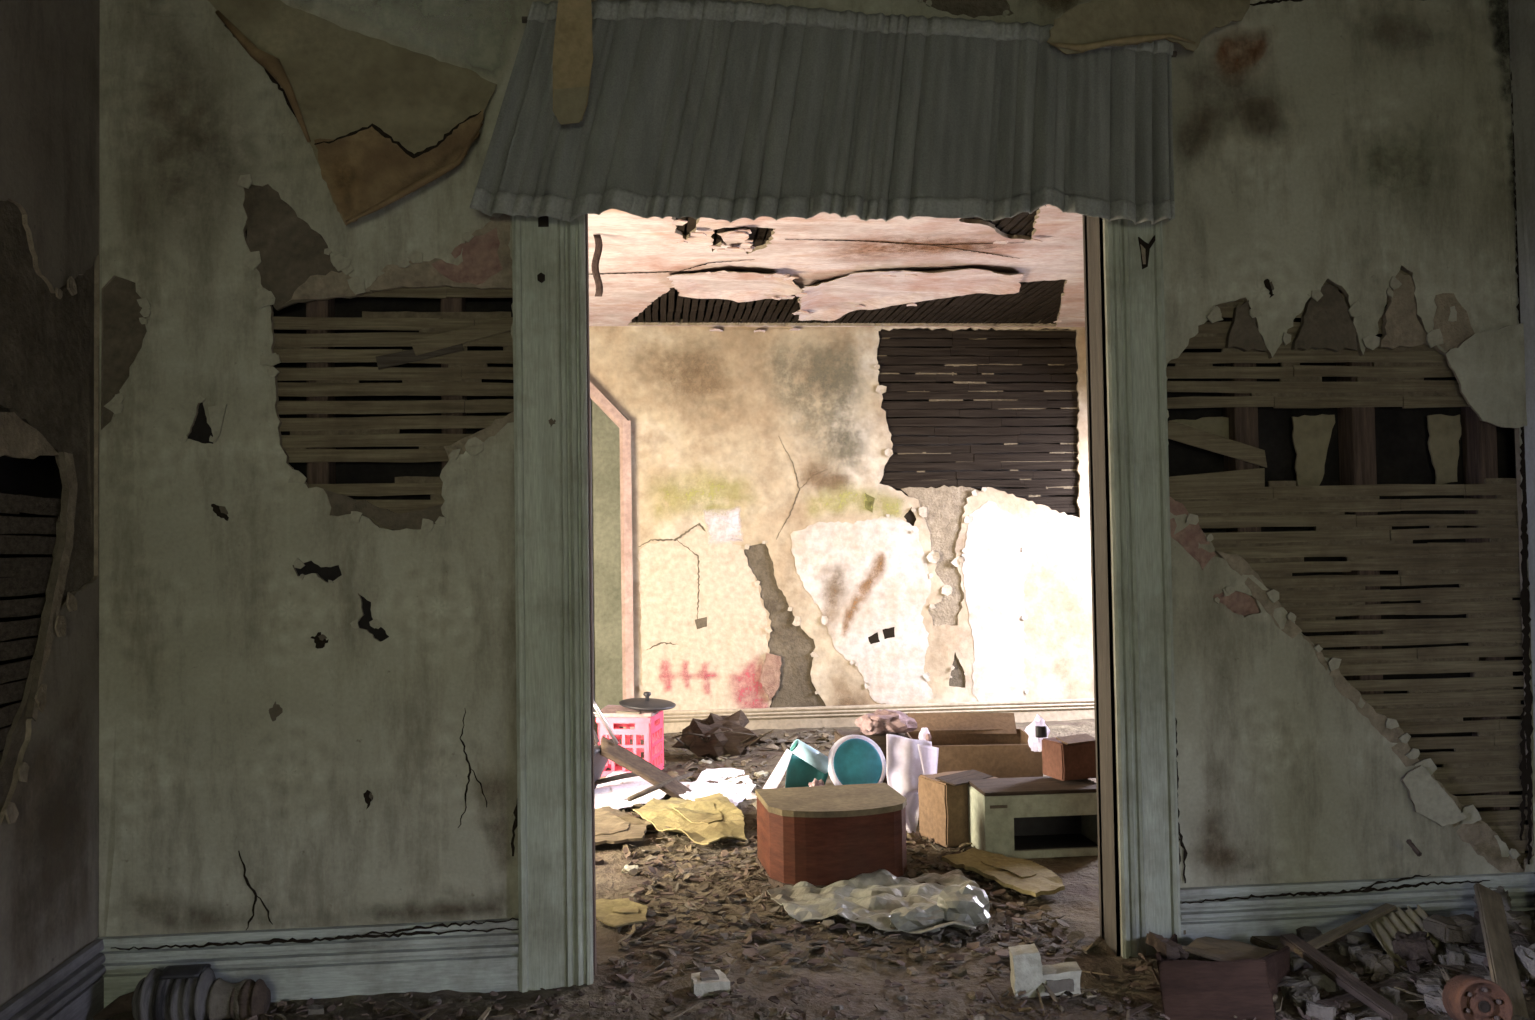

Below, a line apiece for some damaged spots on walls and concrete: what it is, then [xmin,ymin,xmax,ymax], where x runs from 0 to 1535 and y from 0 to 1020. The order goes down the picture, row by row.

crack [1250,0,1303,8]
peeling [591,234,603,297]
flaking render [672,217,773,252]
flaking render [965,205,1046,244]
flaking render [237,174,514,534]
flaking render [0,200,151,824]
flaking render [630,279,1079,711]
spalling [294,558,342,584]
spalling [350,595,389,641]
flaking render [1166,269,1529,873]
crack [458,710,518,856]
crack [111,851,519,950]